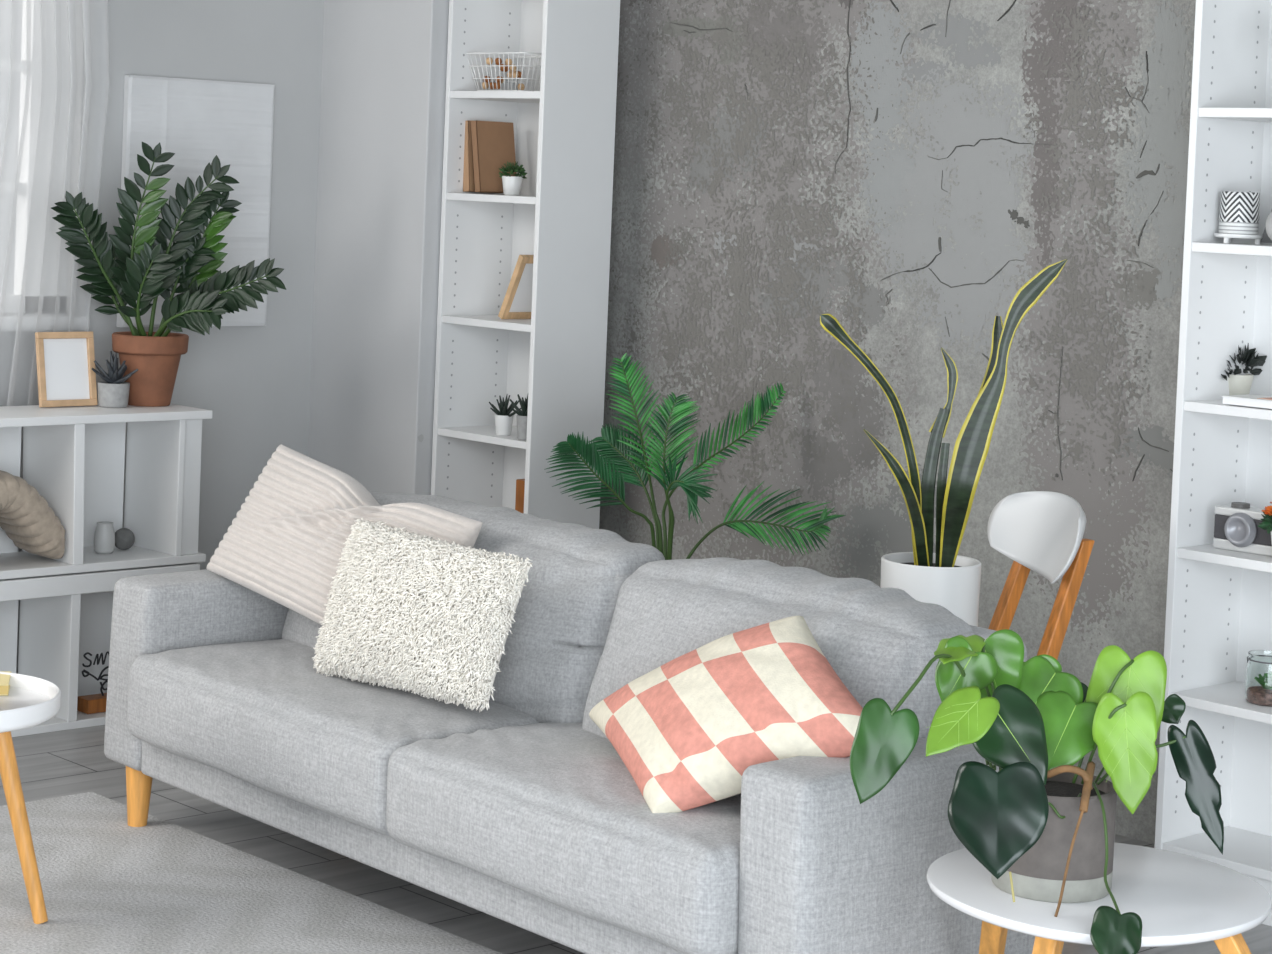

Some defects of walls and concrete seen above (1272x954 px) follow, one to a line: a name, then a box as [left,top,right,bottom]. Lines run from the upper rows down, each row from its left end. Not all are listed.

crack [890,0,951,54]
crack [835,0,851,174]
crack [1125,51,1149,158]
crack [930,138,1056,192]
crack [1126,192,1163,268]
crack [882,253,1022,337]